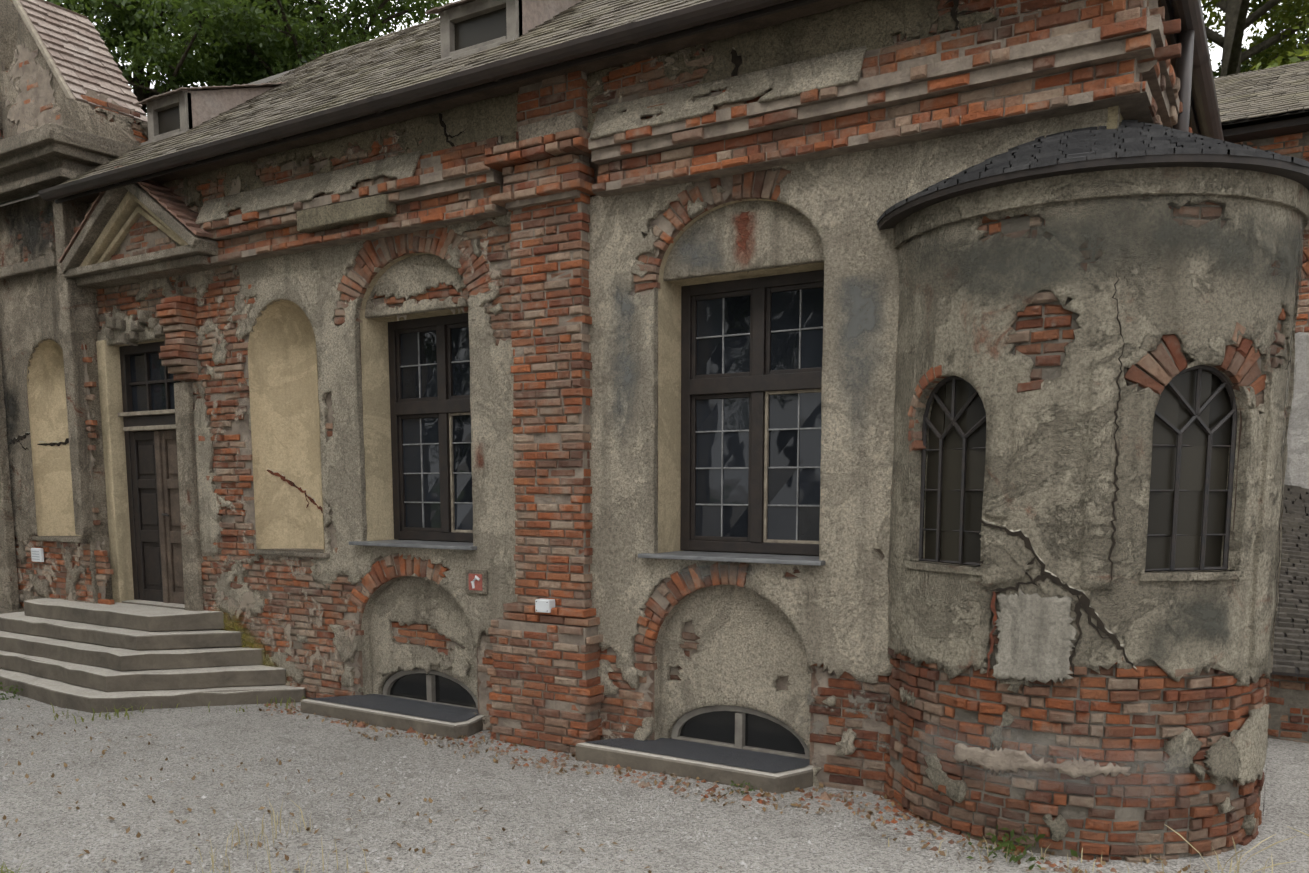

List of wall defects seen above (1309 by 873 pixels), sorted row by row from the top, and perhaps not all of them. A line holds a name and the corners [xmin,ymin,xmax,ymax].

spalling [0,44,62,138]
spalling [80,89,148,146]
spalling [588,44,714,113]
spalling [929,0,1083,35]
spalling [1137,0,1182,73]
spalling [170,130,422,213]
spalling [629,168,791,296]
spalling [1005,291,1080,393]
spalling [94,265,450,699]
crack [977,265,1137,680]
spalling [14,534,115,609]
spalling [807,592,1275,863]